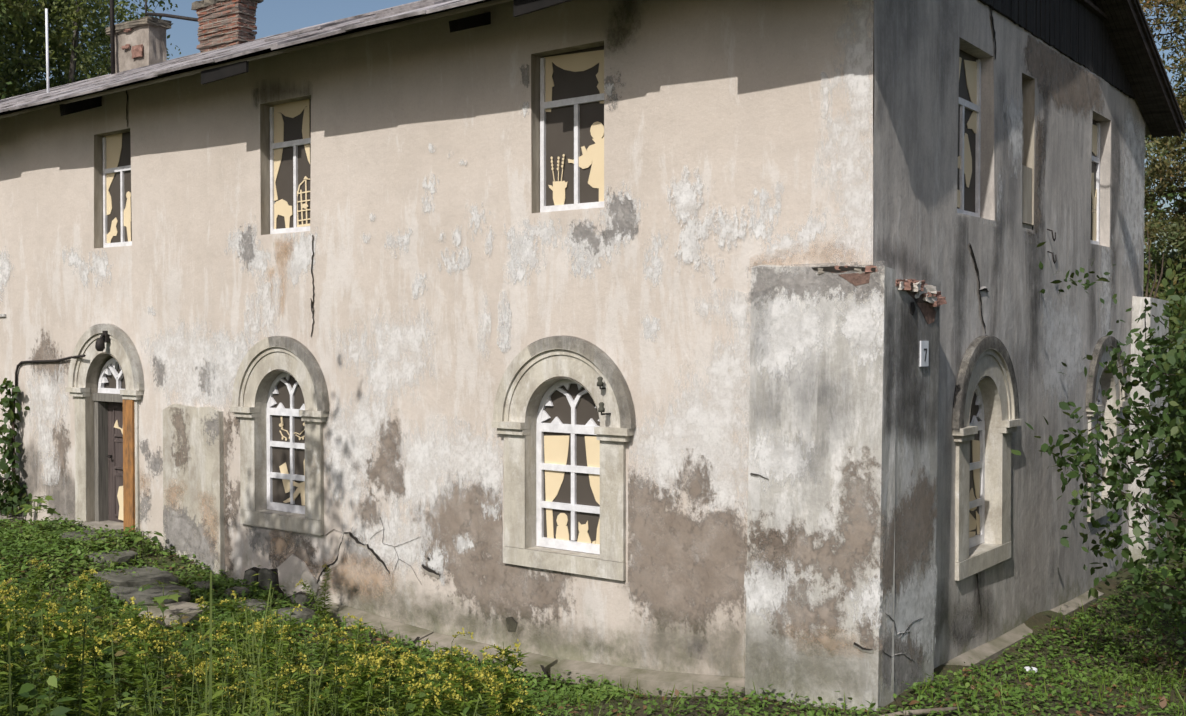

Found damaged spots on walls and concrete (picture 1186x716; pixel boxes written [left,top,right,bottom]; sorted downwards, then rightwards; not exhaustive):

crack [989,7,997,60]
peeling [561,183,641,279]
crack [308,235,316,334]
crack [969,244,989,333]
flaking render [627,0,947,693]
flaking render [139,223,574,634]
crack [317,518,440,590]